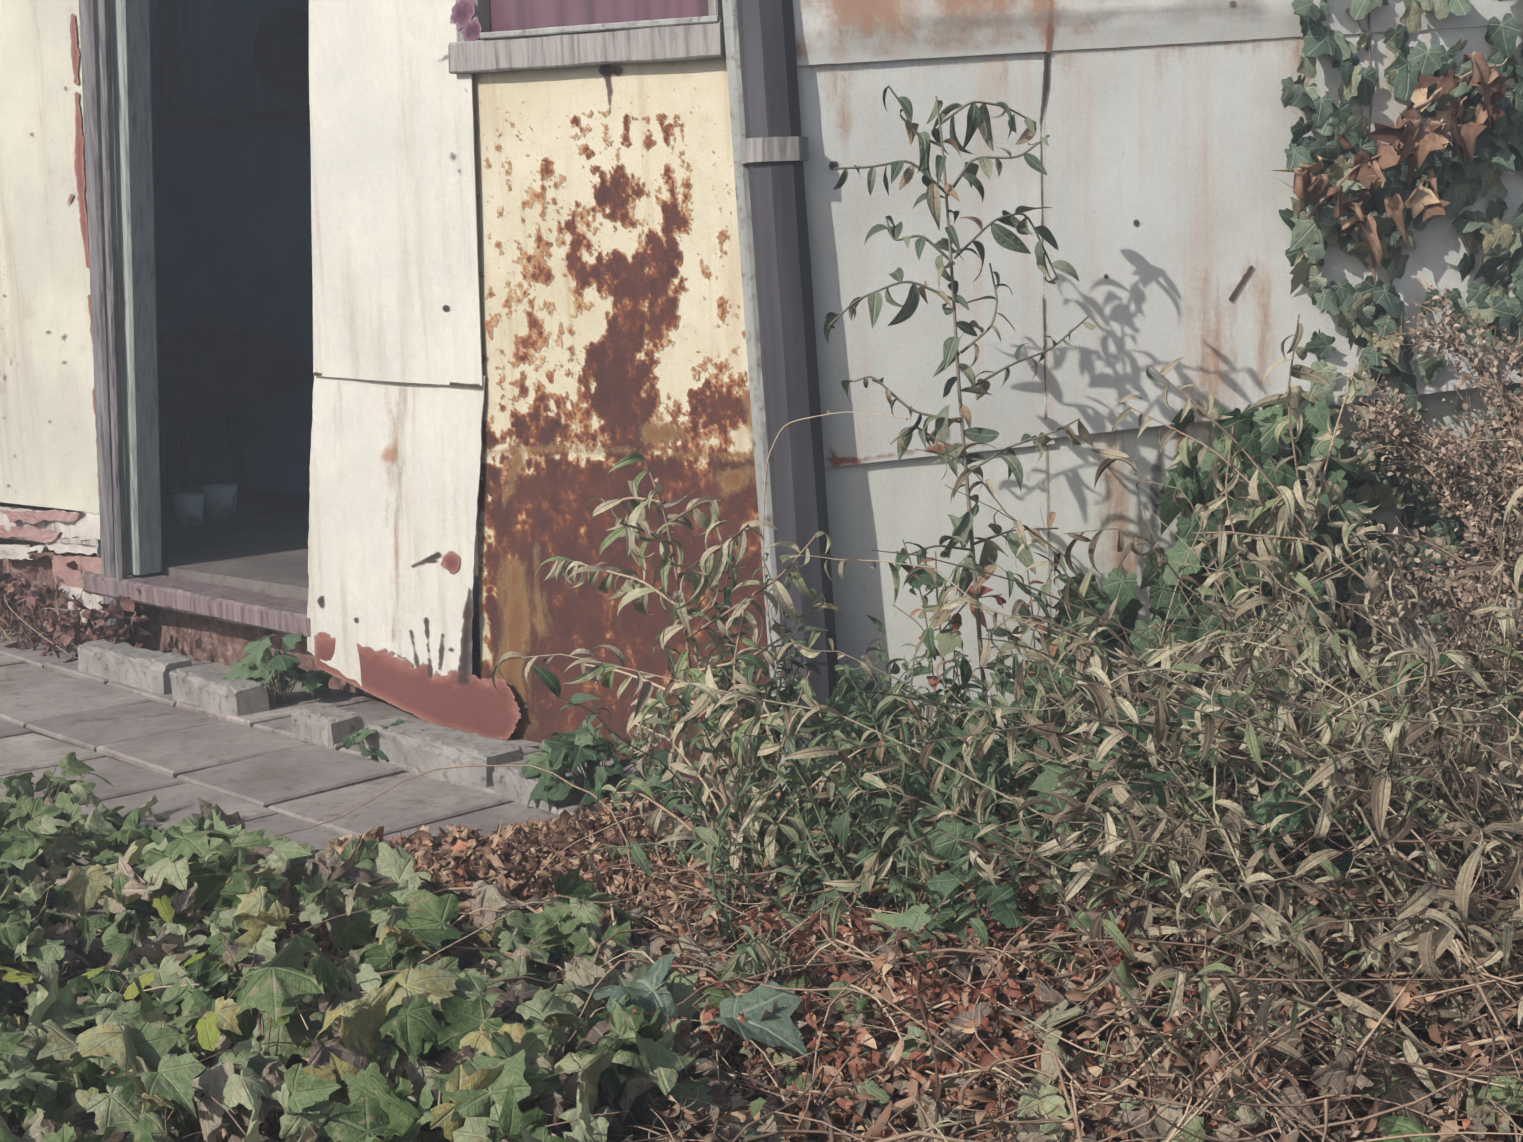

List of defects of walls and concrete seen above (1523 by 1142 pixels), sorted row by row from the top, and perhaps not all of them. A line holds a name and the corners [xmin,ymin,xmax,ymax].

corrosion [832,0,913,34]
corrosion [472,58,775,794]
corrosion [440,551,460,574]